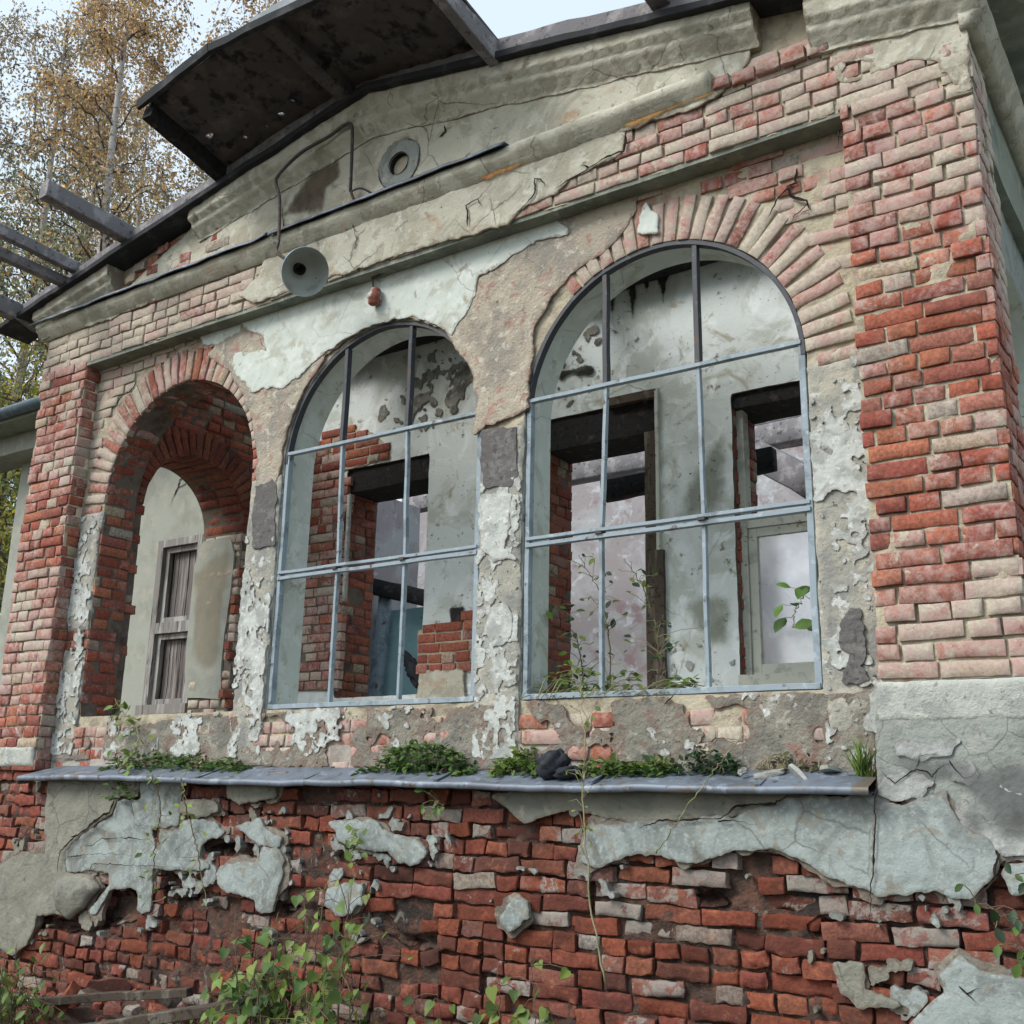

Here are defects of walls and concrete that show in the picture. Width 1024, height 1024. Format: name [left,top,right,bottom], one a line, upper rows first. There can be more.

crack [466,186,490,226]
crack [518,130,627,212]
crack [769,168,811,233]
flaking render [101,50,1024,929]
peeling [50,516,100,761]
flaking render [0,780,456,958]
flaking render [489,893,536,938]
crack [640,794,788,828]
crack [868,747,978,930]
crack [981,853,1001,897]
flaking render [807,912,1024,1024]